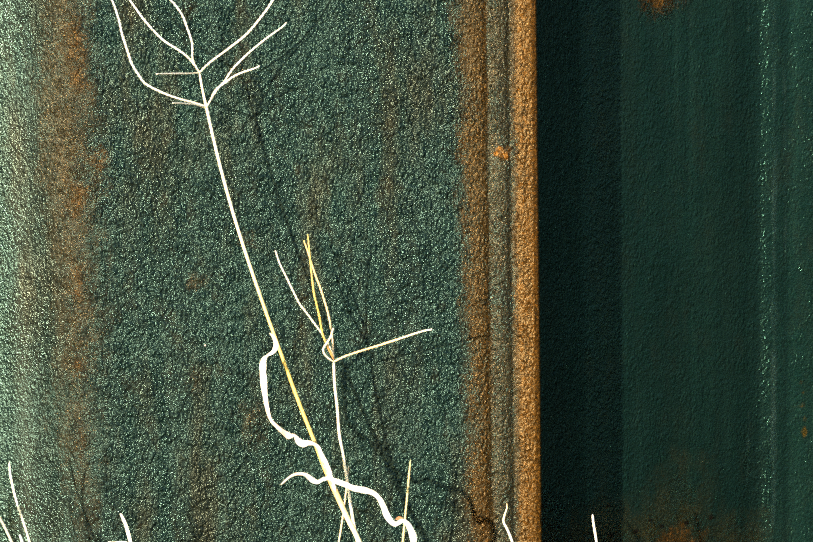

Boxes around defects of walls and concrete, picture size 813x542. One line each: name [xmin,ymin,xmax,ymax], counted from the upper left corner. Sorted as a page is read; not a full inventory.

corrosion [464,0,542,542]